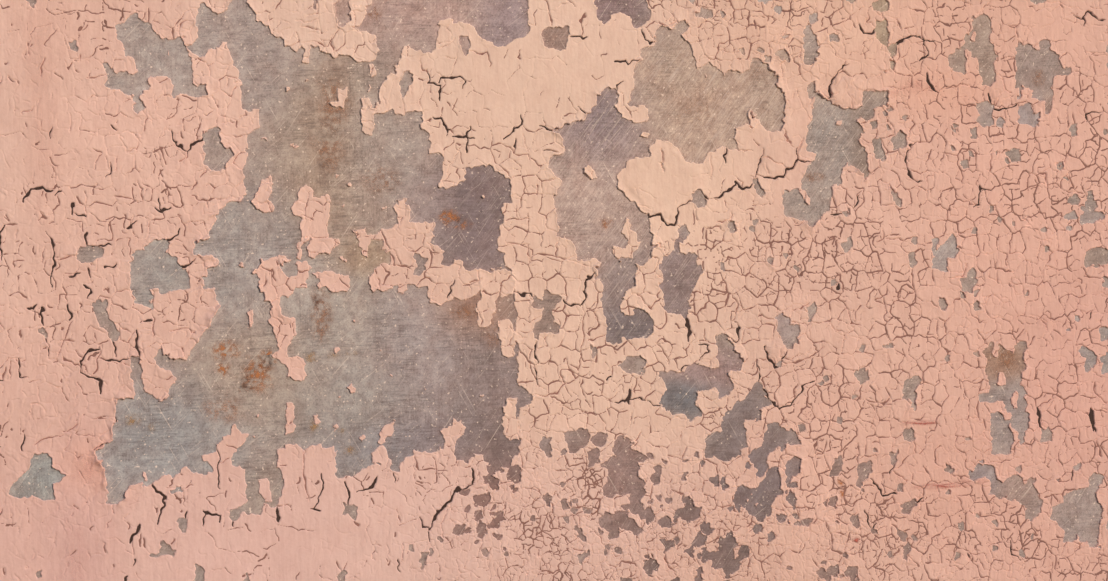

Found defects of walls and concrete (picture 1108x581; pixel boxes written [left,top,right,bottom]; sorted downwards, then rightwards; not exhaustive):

crack [0,0,257,475]
peeling [92,0,569,570]
peeling [548,0,790,359]
crack [262,0,1108,581]
peeling [782,82,907,227]
peeling [948,14,998,87]
peeling [1015,40,1071,127]
peeling [9,453,66,500]
crack [70,445,331,581]
peeling [539,428,749,581]
peeling [659,333,813,542]
peeling [968,341,1108,548]